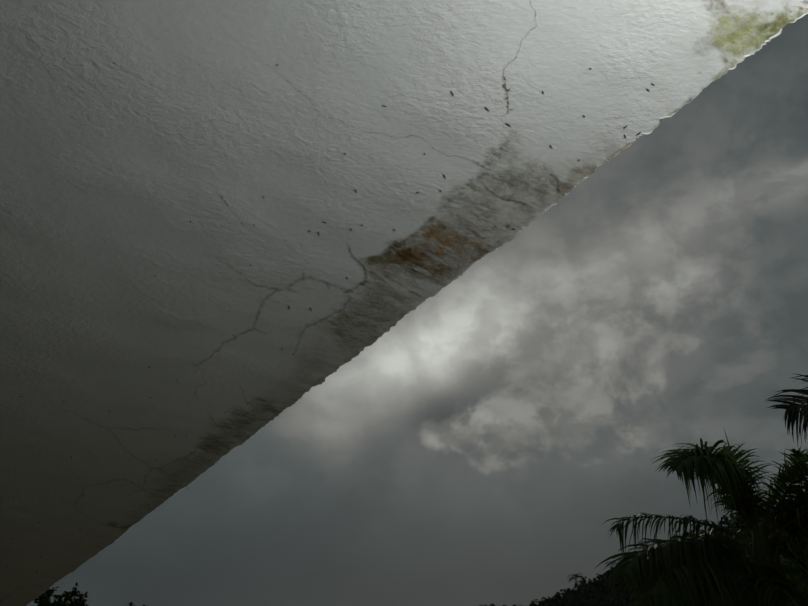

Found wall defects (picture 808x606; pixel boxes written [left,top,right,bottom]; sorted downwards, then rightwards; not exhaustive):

corrosion [388,212,494,296]